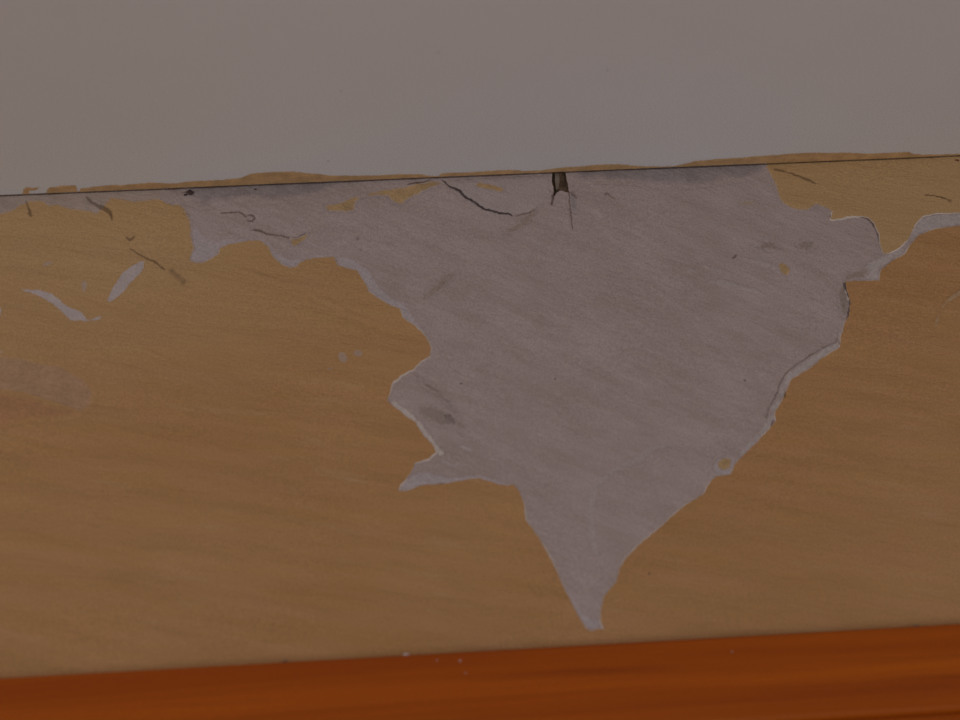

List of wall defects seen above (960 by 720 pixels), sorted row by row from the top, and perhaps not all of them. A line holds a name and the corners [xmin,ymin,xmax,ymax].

crack [0,155,960,216]
peeling [0,163,960,631]